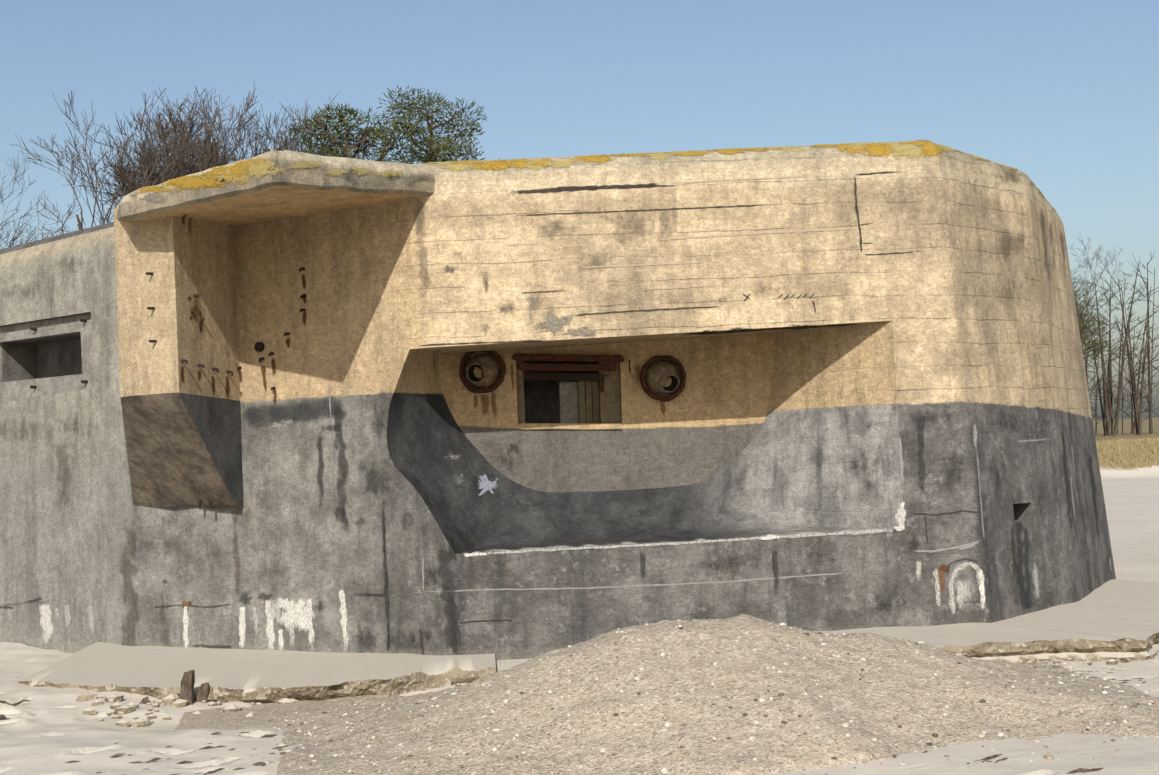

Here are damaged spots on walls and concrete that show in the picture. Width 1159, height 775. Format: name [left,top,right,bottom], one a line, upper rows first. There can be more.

crack [517,183,758,216]
crack [854,171,912,255]
corrosion [188,294,203,332]
corrosion [198,371,242,397]
corrosion [261,359,276,404]
corrosion [474,393,496,415]
leakage [29,598,71,644]